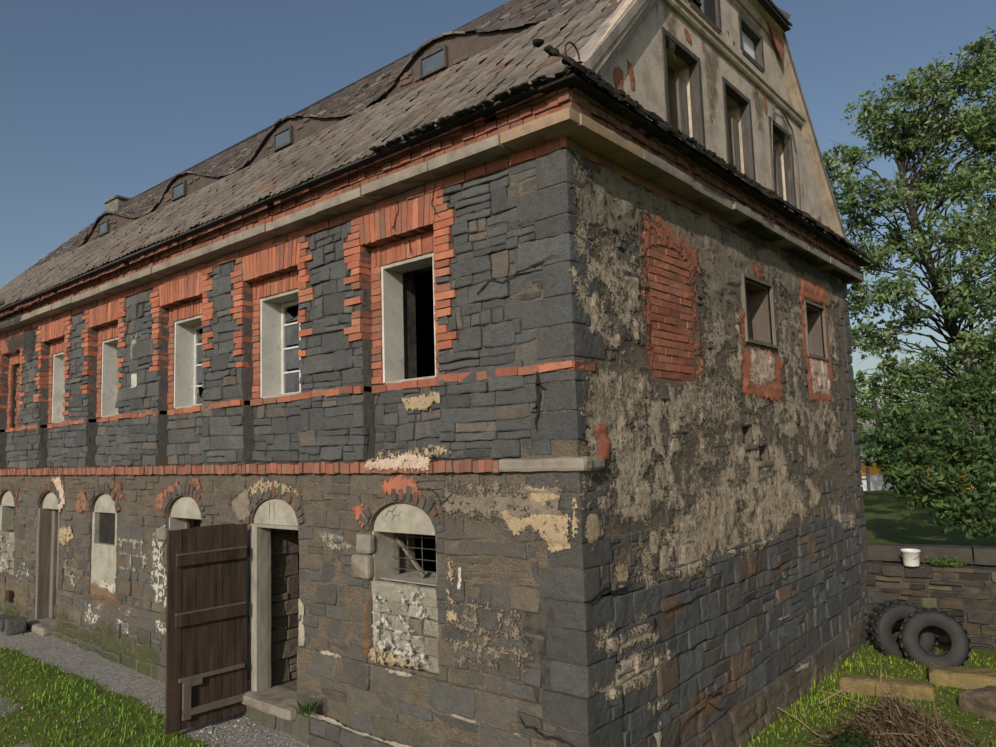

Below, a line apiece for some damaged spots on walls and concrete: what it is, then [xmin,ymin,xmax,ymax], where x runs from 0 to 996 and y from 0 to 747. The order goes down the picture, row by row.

peeling [364,149,856,714]
peeling [42,477,88,515]
flaking render [154,476,205,512]
flaking render [350,501,368,532]
peeling [58,526,74,546]
peeling [117,525,167,608]